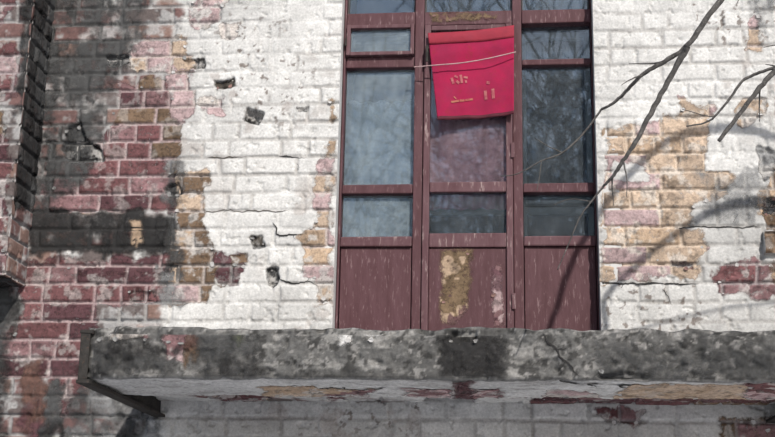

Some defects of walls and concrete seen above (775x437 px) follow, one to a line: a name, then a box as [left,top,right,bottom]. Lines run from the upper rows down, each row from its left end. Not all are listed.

peeling [189,0,239,40]
damp [29,0,69,212]
damp [101,223,132,259]
peeling [0,34,265,419]
crack [206,209,314,239]
peeling [599,95,736,286]
spalling [756,145,775,253]
spalling [267,267,280,288]
peeling [710,256,775,301]
damp [438,335,509,376]
crack [543,334,644,388]
peeling [530,369,775,428]